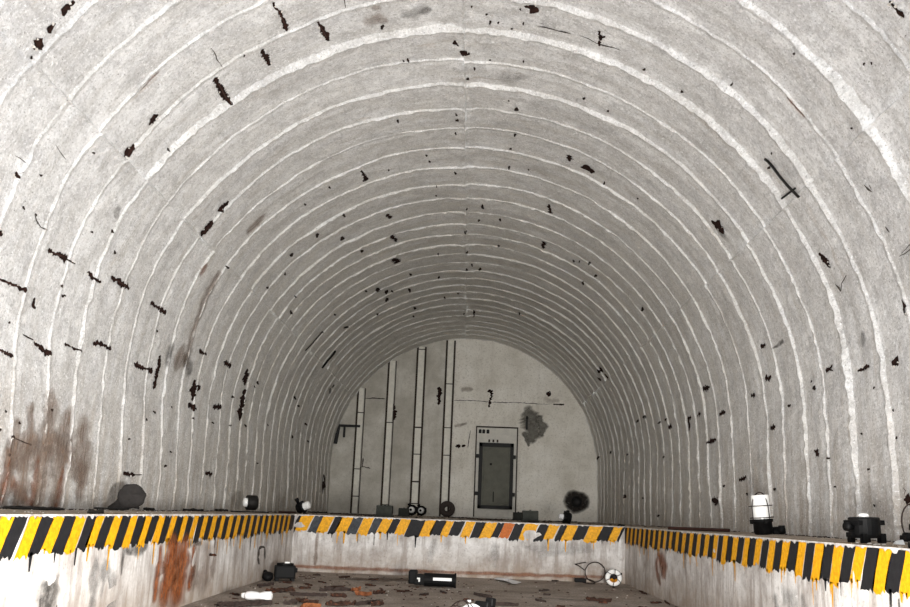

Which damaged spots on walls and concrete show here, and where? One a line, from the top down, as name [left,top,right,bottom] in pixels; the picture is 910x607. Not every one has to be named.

water stain [520,407,548,446]
corrosion [153,537,195,607]